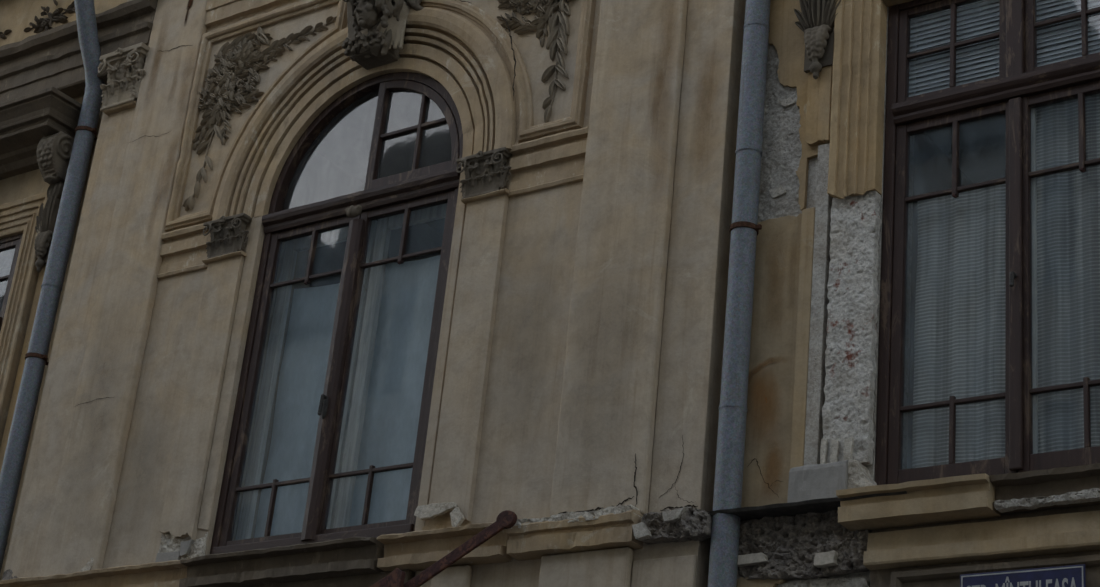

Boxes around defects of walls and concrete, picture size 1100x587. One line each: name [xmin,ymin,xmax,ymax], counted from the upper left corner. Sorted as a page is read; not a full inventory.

spalling [758,42,802,222]
spalling [820,191,881,489]
crack [558,435,698,514]
spalling [155,532,208,563]
spalling [511,504,712,544]
spalling [737,510,871,587]